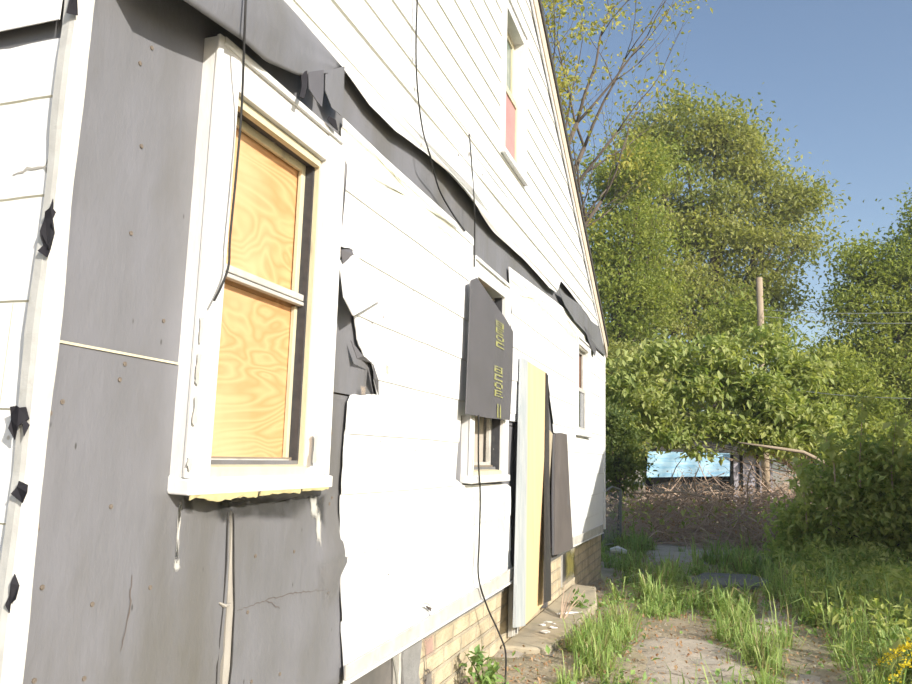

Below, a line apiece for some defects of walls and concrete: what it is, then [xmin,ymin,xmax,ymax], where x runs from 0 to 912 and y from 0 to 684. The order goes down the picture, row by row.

damp [482,495,507,541]
crack [237,589,329,611]